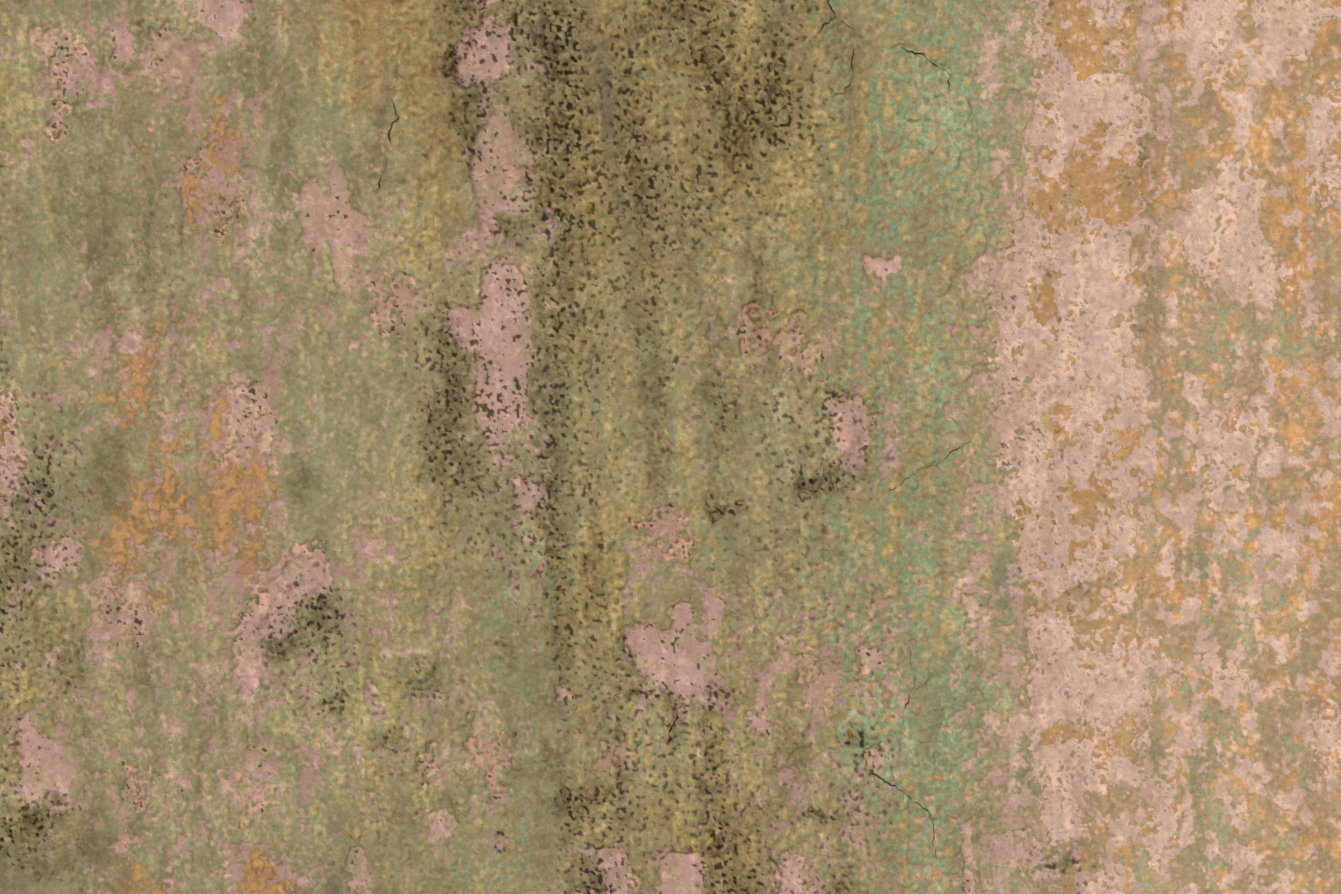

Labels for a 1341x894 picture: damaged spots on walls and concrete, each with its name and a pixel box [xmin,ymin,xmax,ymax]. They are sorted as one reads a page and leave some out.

peeling [449,0,511,87]
peeling [470,102,535,210]
leakage [509,2,579,151]
leakage [615,49,638,161]
leakage [670,0,724,66]
leakage [720,72,790,149]
peeling [1181,81,1341,299]
leakage [428,353,464,430]
peeling [442,257,535,451]
peeling [822,394,879,473]
peeling [977,0,1182,880]
peeling [623,592,725,707]